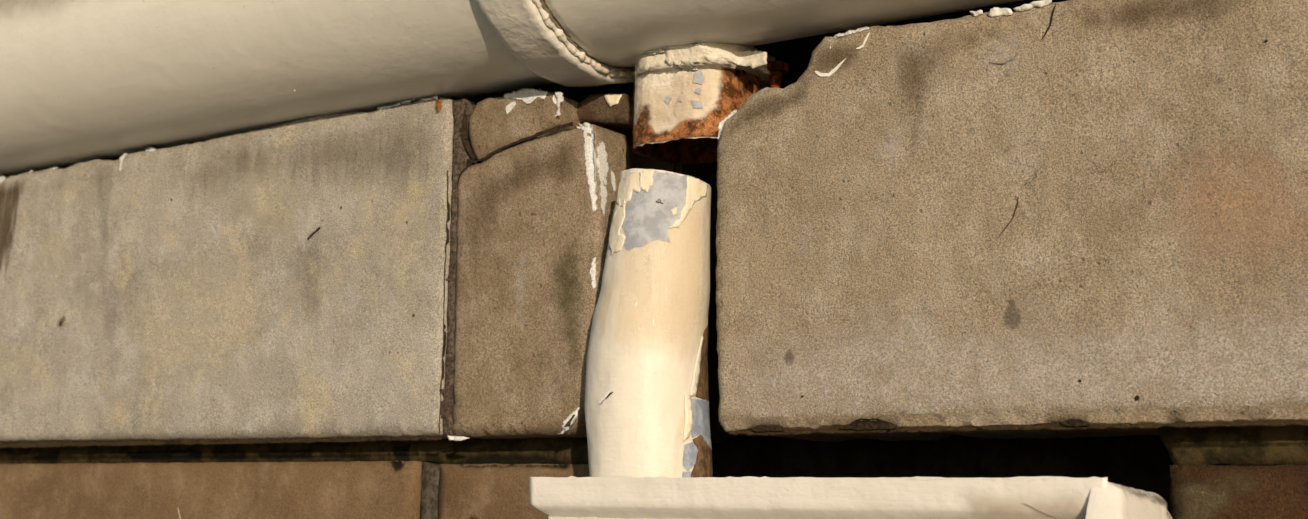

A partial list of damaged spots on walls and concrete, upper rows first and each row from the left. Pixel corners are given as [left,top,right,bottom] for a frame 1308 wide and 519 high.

peeling [504,89,564,118]
rust [633,68,761,156]
leakage [0,185,19,267]
peeling [577,122,708,288]
crack [995,196,1019,241]